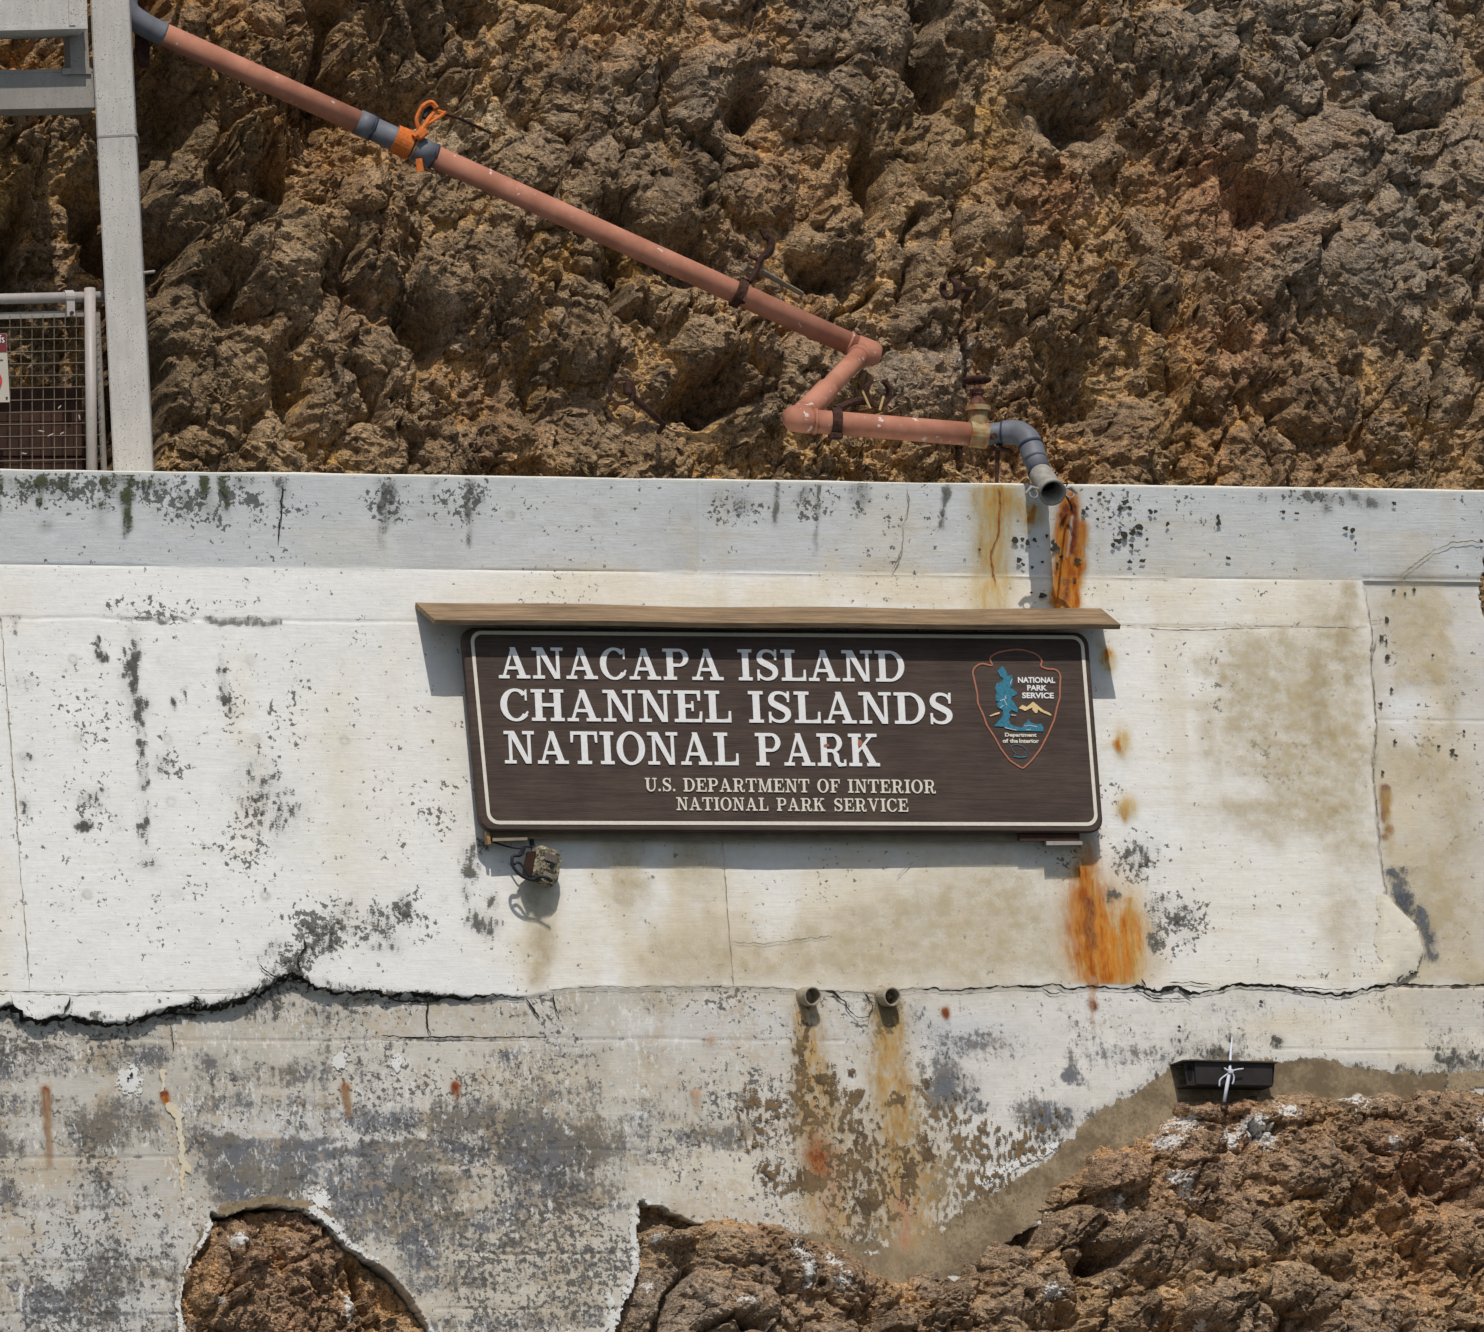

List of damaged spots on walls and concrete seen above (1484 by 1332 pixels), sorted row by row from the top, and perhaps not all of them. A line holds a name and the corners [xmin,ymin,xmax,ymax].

water stain [465,478,485,542]
water stain [939,484,952,526]
rust [978,484,1088,609]
water stain [1290,489,1378,510]
water stain [125,615,282,625]
crack [0,592,1484,1051]
rust [1064,843,1145,1010]
rust [793,998,856,1237]
rust [862,992,938,1251]
peeling [732,1002,1484,1284]
peeling [174,1195,379,1332]
spalling [600,1216,640,1332]